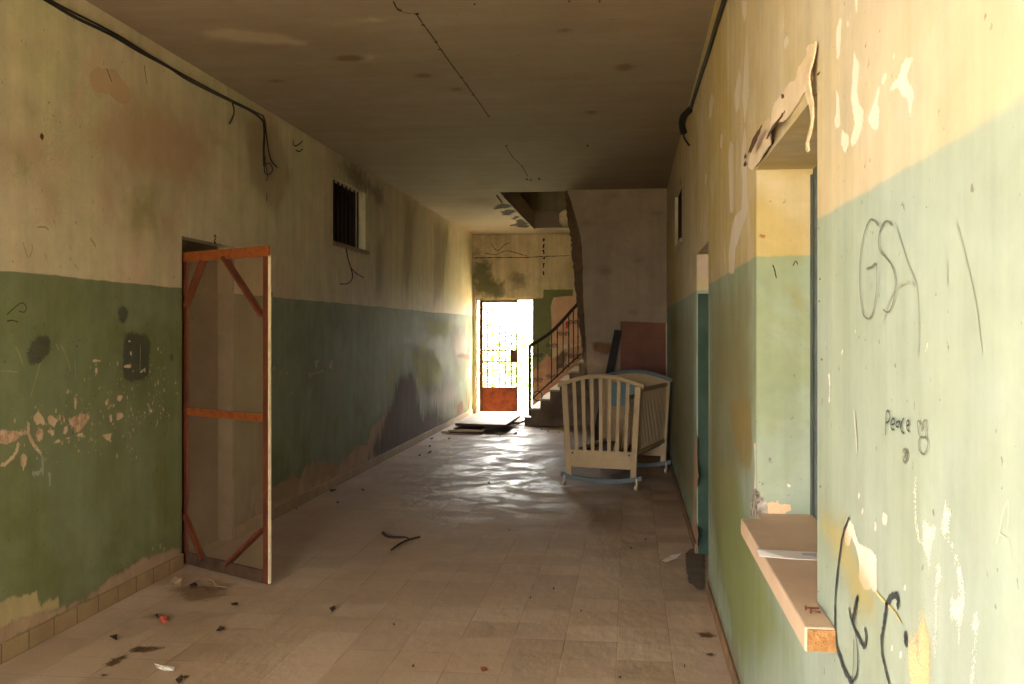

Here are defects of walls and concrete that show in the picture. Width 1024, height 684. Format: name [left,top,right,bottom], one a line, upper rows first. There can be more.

crack [393,1,489,116]
peeling [836,0,858,59]
peeling [834,52,914,153]
peeling [720,38,817,274]
spalling [493,195,535,230]
leakage [368,217,470,461]
peeling [0,340,178,471]
spalling [750,442,792,516]
peeling [844,493,877,593]
peeling [0,547,181,644]
peeling [891,593,933,684]